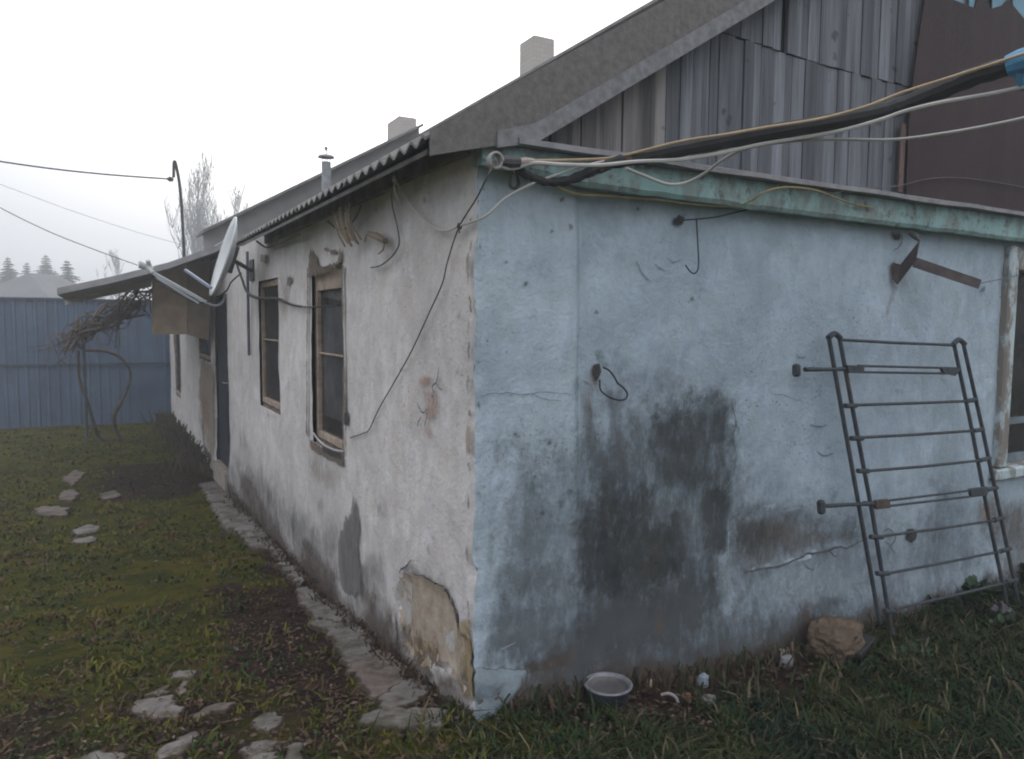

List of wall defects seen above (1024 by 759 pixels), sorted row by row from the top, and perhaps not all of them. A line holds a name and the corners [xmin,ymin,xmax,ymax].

flaking render [306,248,348,467]
damp [227,474,419,672]
flaking render [387,571,473,700]
damp [429,399,838,716]
crack [744,528,896,573]